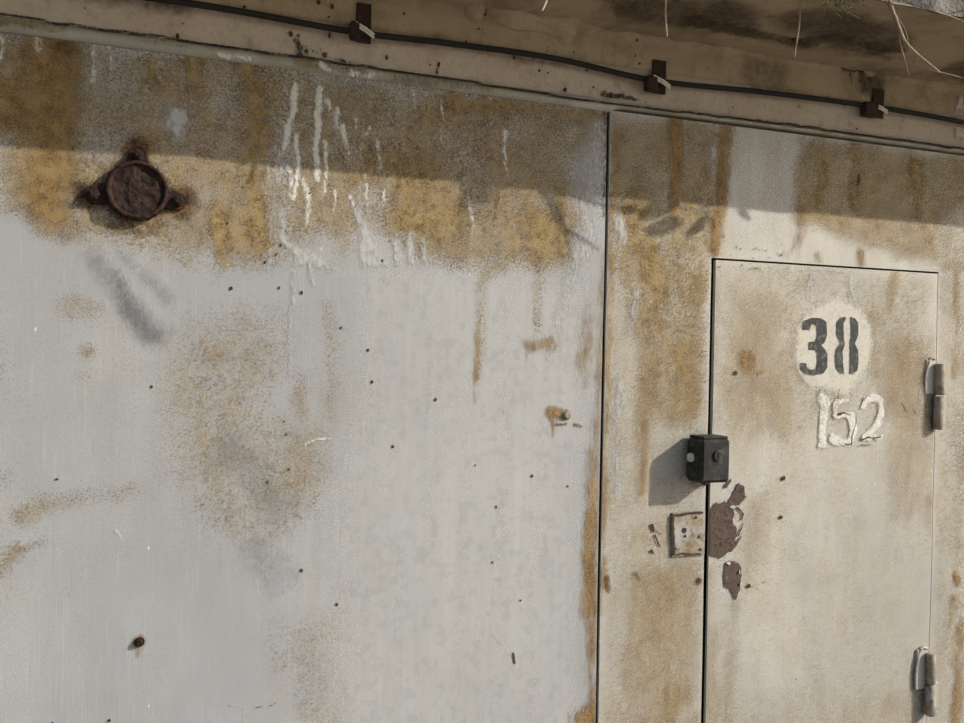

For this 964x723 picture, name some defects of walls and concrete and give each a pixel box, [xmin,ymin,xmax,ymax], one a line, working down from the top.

leakage [616,1,906,59]
rust [793,138,964,331]
rust [0,34,733,723]
rust [721,270,927,434]
peeling [671,479,763,600]
rust [934,389,964,723]